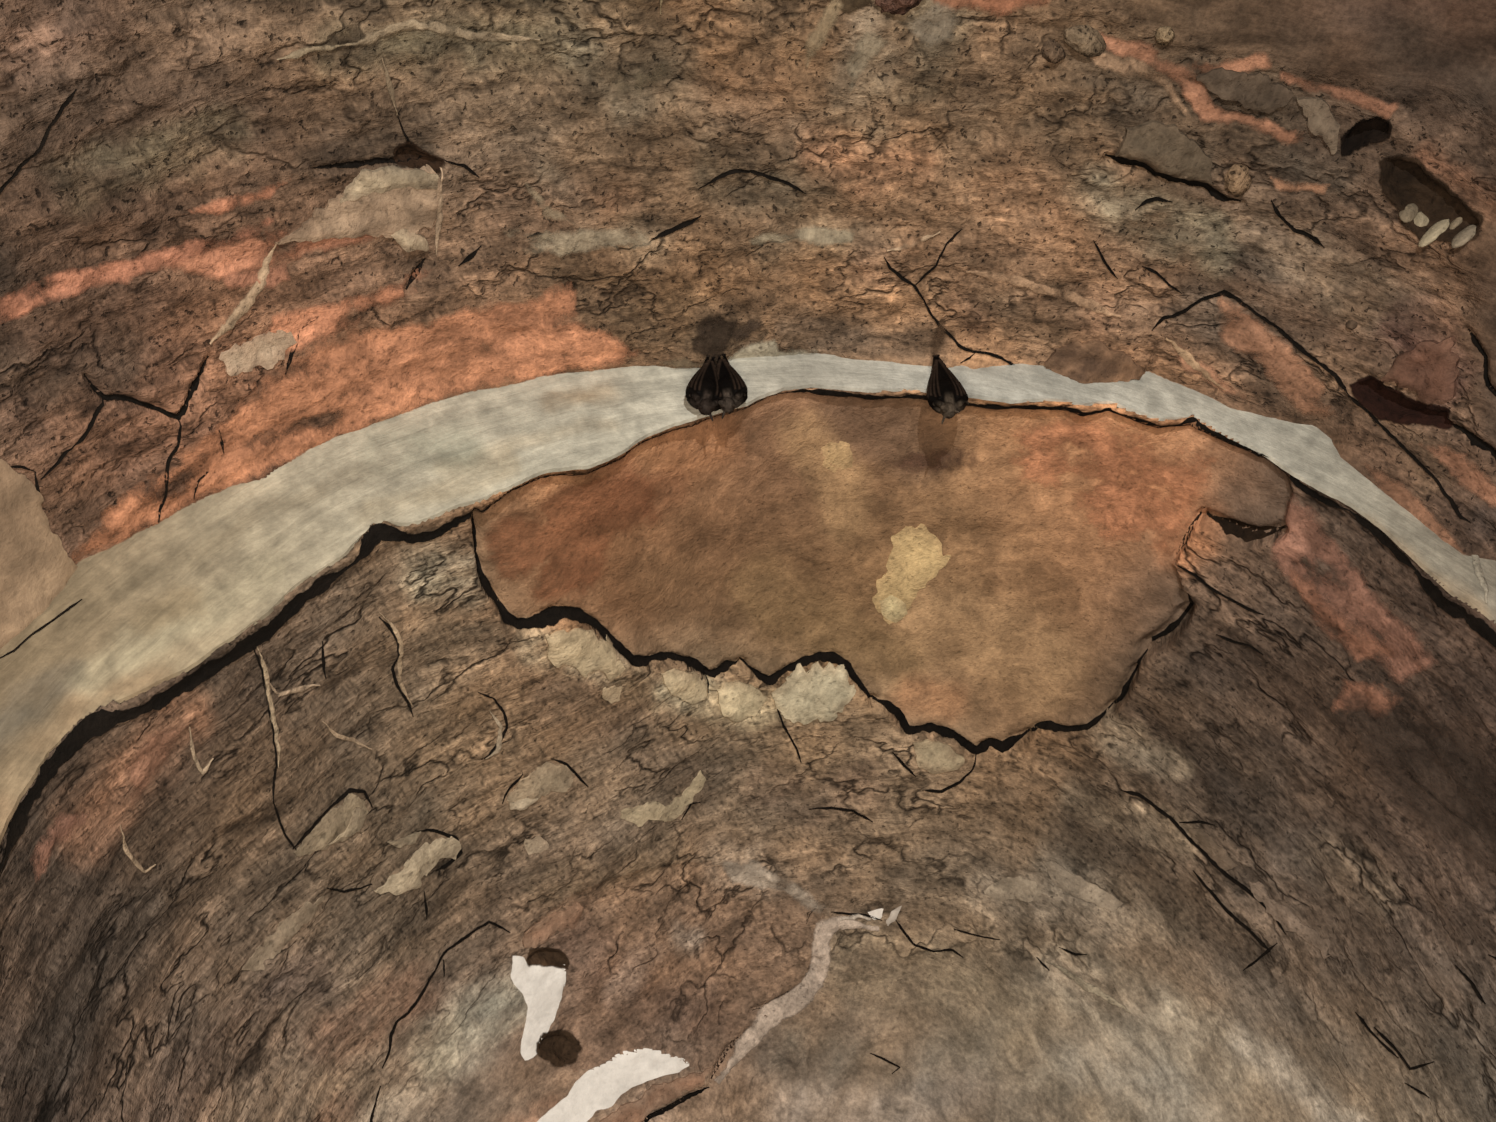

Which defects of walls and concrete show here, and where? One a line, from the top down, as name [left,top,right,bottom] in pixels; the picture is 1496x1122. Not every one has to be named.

flaking render [511,860,902,1122]